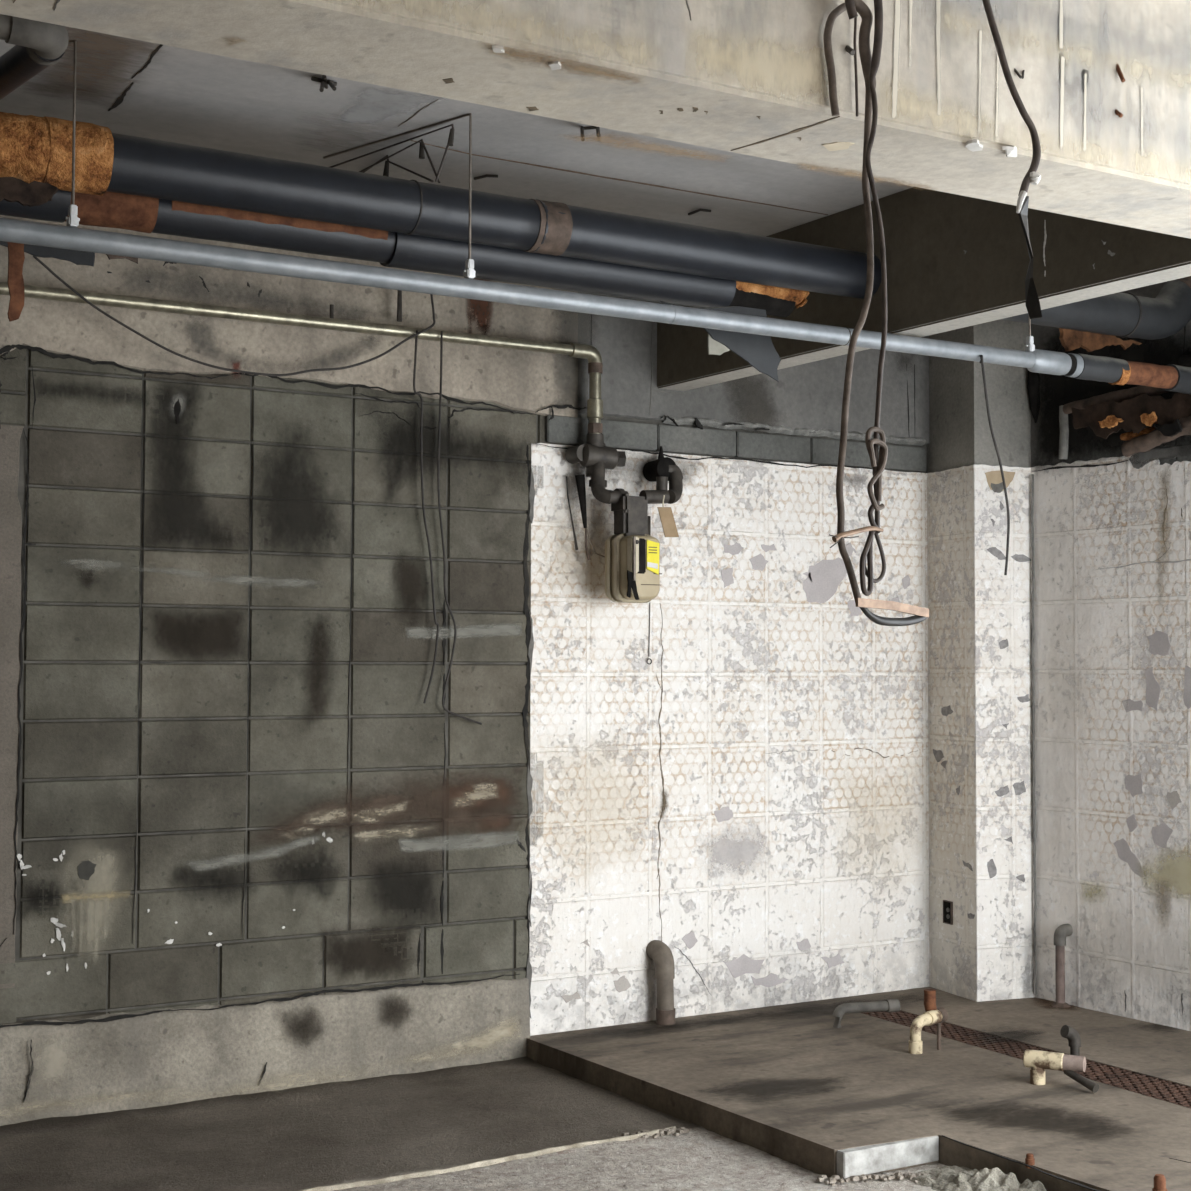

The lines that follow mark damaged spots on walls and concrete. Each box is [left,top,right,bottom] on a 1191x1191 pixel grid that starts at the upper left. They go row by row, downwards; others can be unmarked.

leakage [172,396,184,424]
spalling [1129,445,1191,469]
peeling [721,542,777,588]
peeling [803,543,857,603]
spalling [987,547,1032,562]
peeling [1122,631,1171,713]
crack [656,604,712,996]
spalling [994,781,1026,797]
peeling [723,954,788,987]
crack [0,974,520,1103]
leakage [288,1010,322,1043]
leakage [385,998,410,1024]